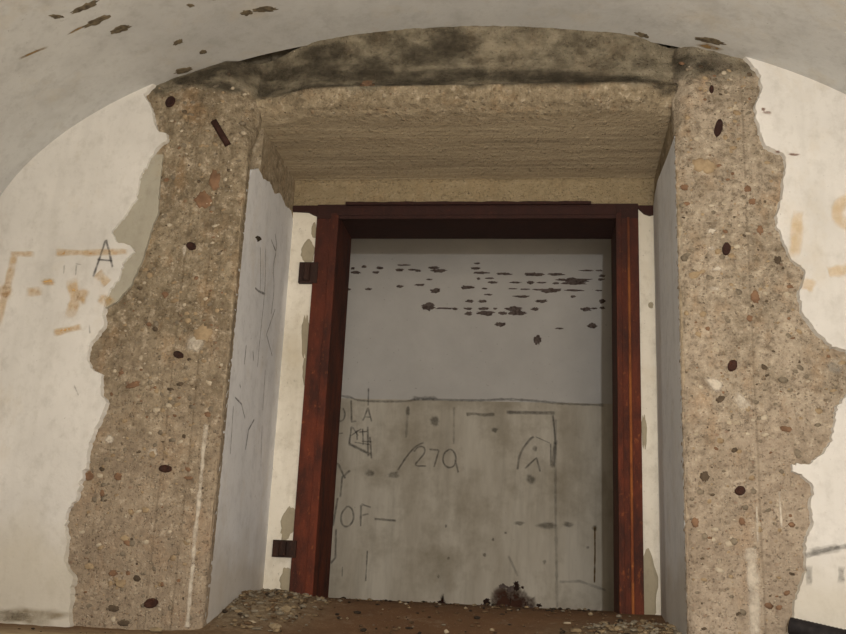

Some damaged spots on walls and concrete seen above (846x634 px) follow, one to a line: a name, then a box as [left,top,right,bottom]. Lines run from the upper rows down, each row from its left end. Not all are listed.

peeling [240,6,278,16]
damp [174,61,258,89]
damp [264,31,641,95]
spalling [67,61,262,630]
spalling [256,25,846,634]